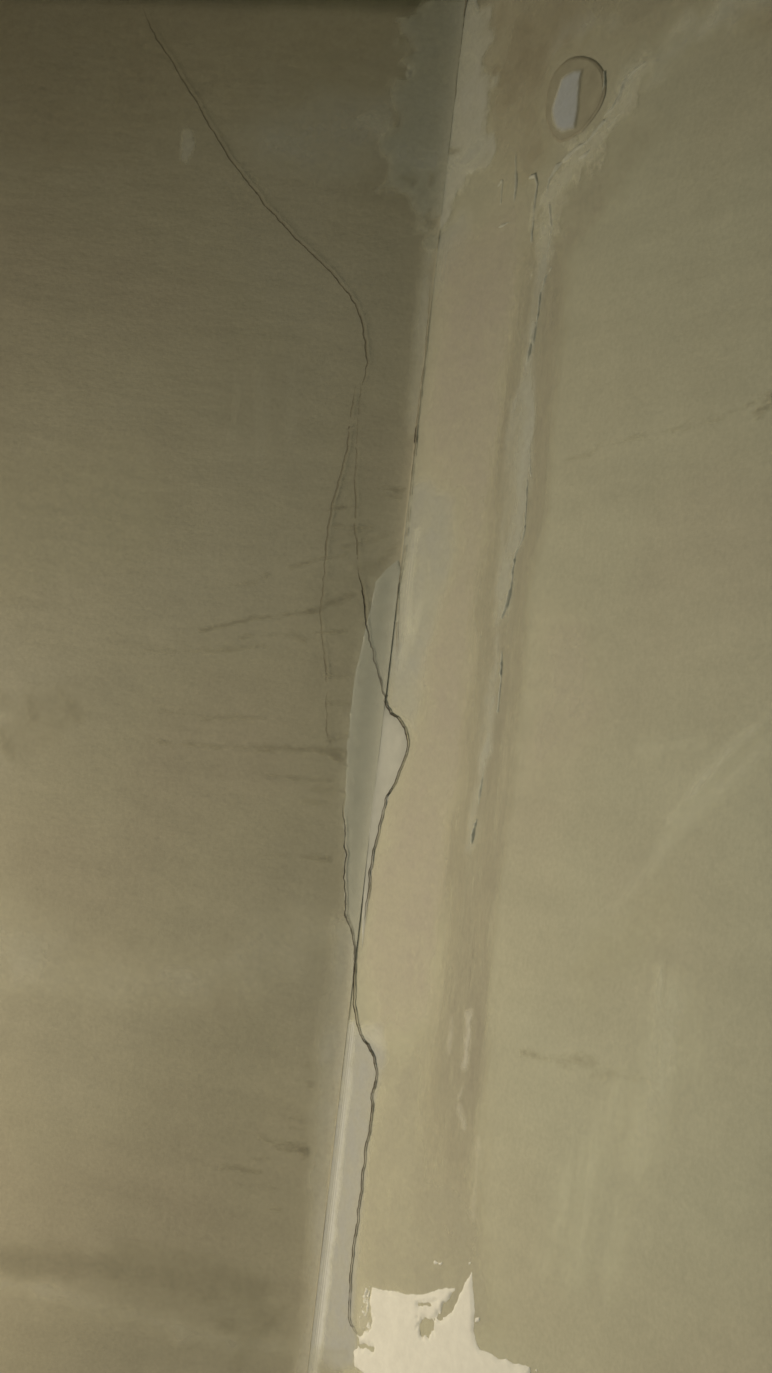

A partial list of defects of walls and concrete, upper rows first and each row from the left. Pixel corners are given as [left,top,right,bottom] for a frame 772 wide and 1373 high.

crack [144,11,430,1334]